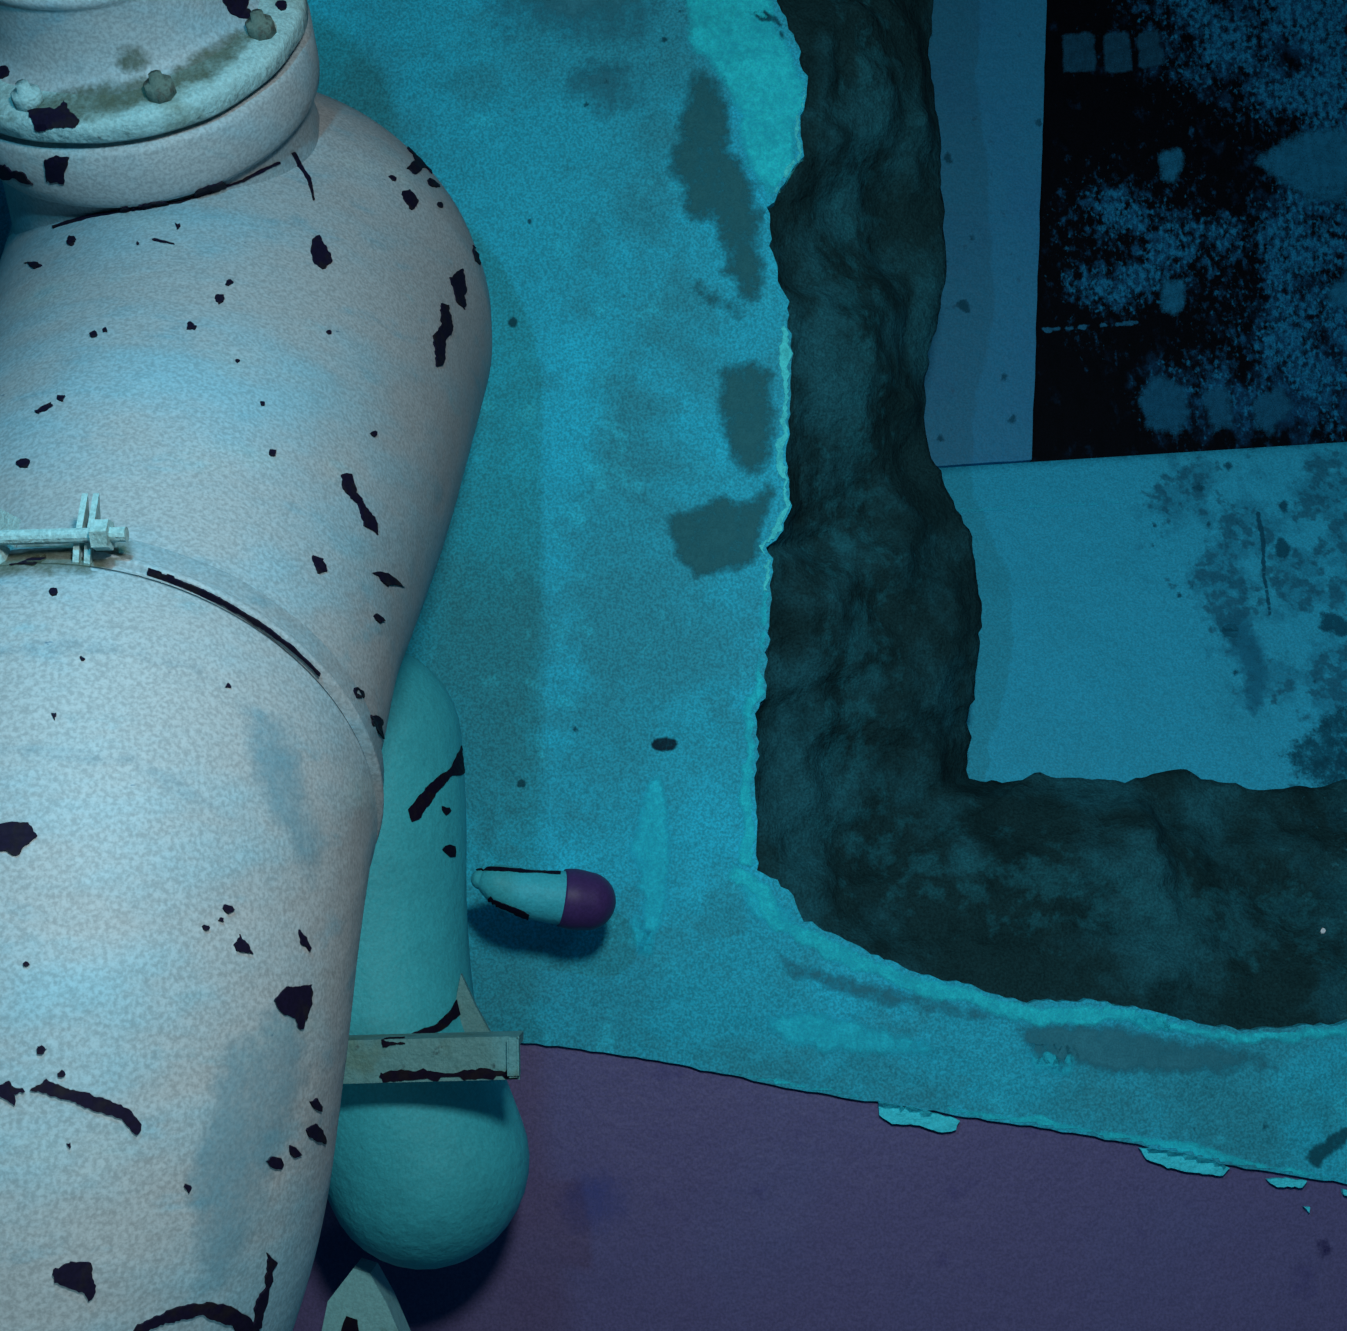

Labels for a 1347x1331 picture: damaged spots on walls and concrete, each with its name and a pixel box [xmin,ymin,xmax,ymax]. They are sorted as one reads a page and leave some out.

damp [671,74,764,299]
damp [721,362,774,473]
damp [671,486,775,576]
flaking render [759,326,793,648]
damp [1275,538,1290,558]
damp [1319,612,1347,637]
flaking render [729,668,1347,1043]